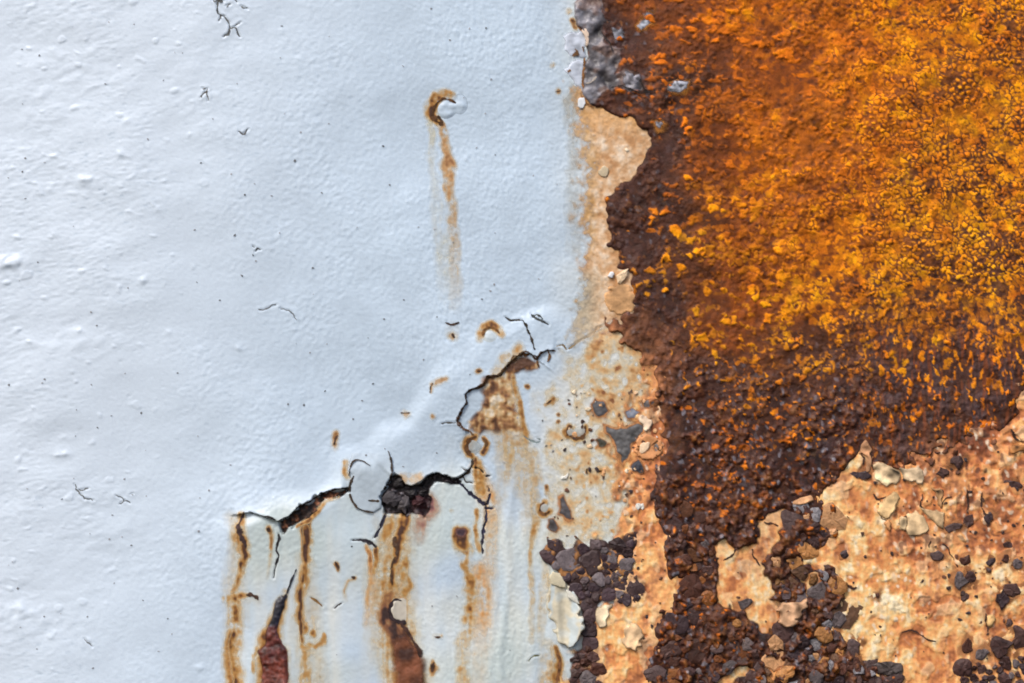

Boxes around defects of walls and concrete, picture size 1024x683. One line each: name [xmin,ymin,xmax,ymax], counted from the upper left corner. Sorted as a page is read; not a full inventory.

crack [505,314,603,350]
corrosion [527,0,1024,683]
peeling [591,398,655,474]
crack [251,512,281,578]
corrosion [223,512,327,683]
crack [352,512,387,548]
corrosion [365,513,426,683]
corrosion [452,456,497,683]
crack [456,459,494,554]
peeling [546,571,613,648]
peeling [850,440,993,536]
peeling [962,583,1024,660]